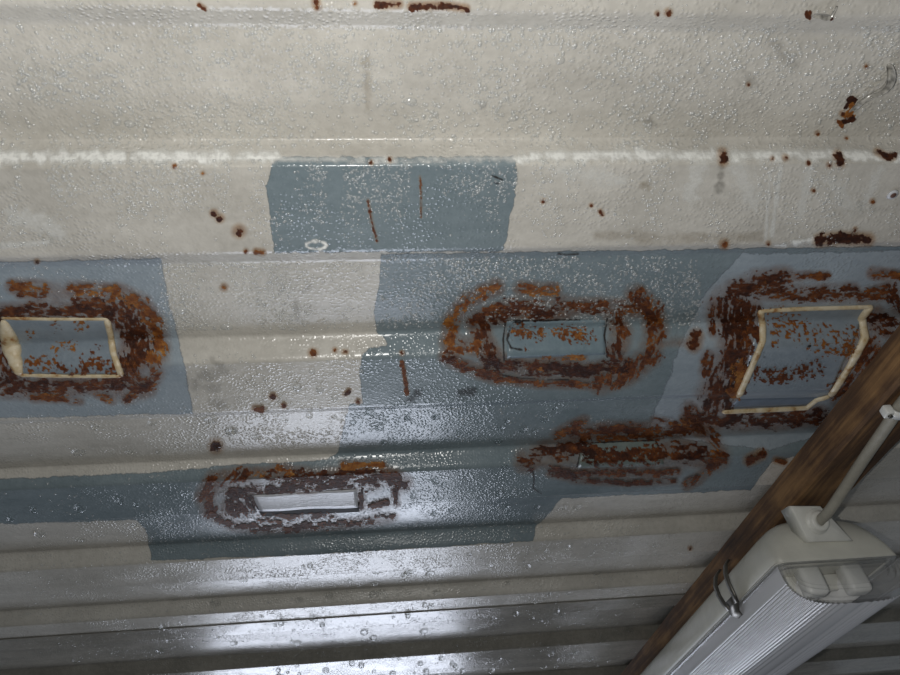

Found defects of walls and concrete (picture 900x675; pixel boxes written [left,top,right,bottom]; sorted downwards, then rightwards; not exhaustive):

rust [374,1,470,13]
rust [829,152,845,167]
rust [815,229,872,247]
rust [0,280,169,404]
rust [399,351,409,396]
rust [440,283,667,395]
rust [517,269,900,487]
rust [199,461,409,534]